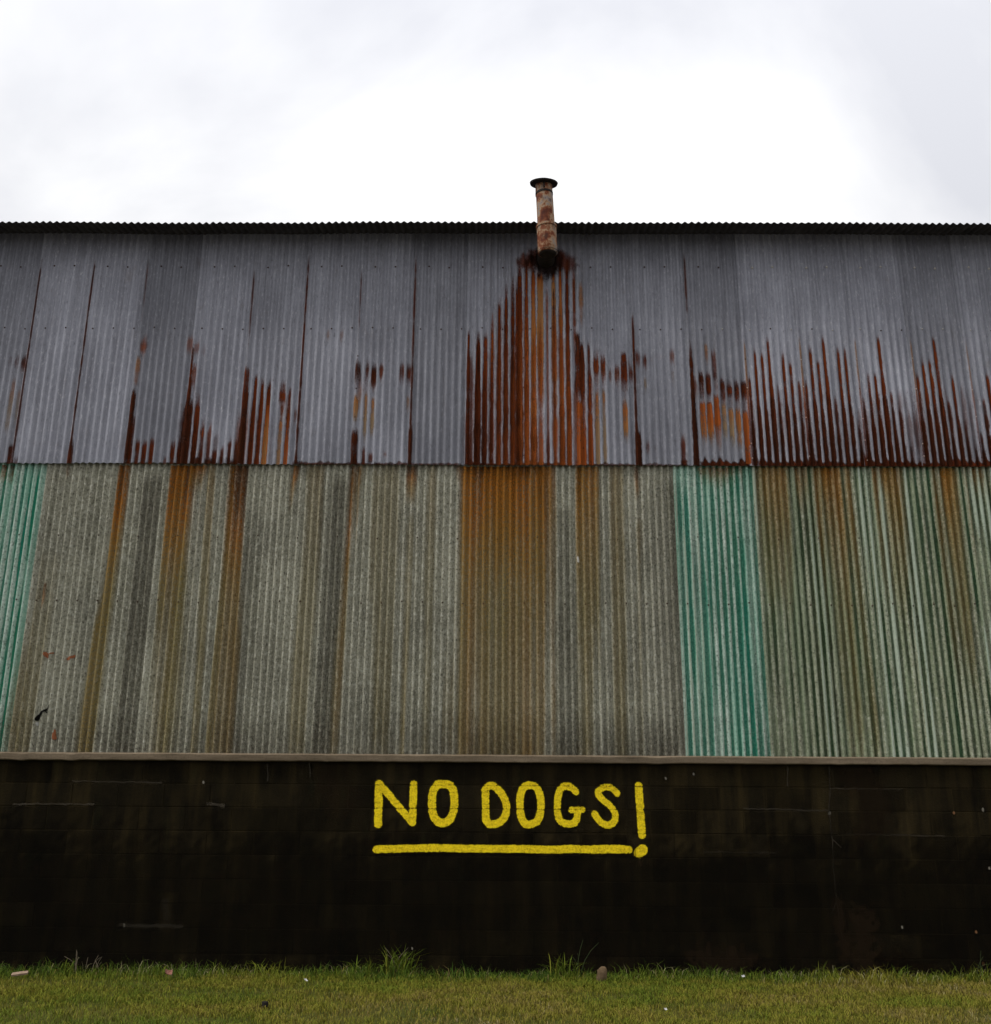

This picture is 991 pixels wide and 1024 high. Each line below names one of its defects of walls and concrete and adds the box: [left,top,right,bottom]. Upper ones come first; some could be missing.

rust [157,249,649,755]
rust [681,338,991,627]